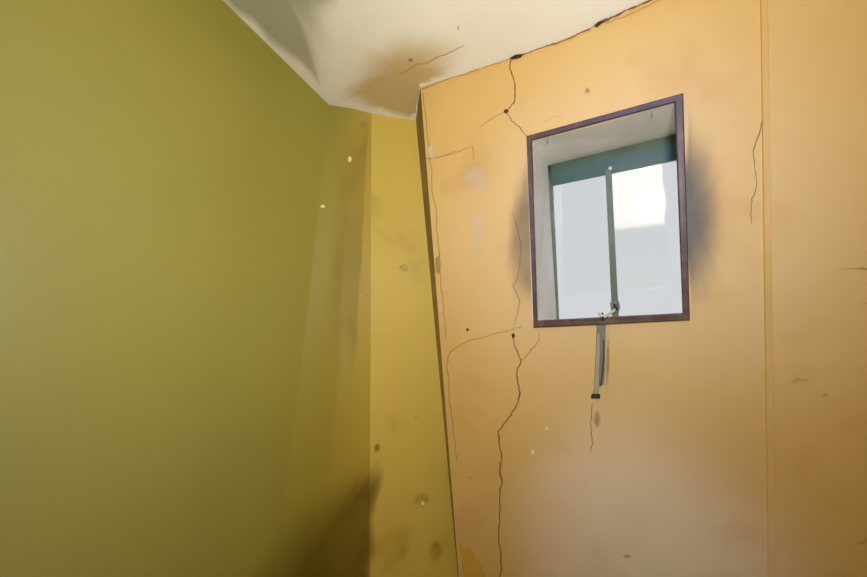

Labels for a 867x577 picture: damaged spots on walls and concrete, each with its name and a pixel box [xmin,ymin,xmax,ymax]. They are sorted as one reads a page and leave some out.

damp [362,61,434,113]
crack [400,45,464,74]
crack [750,122,762,224]
crack [422,0,659,577]